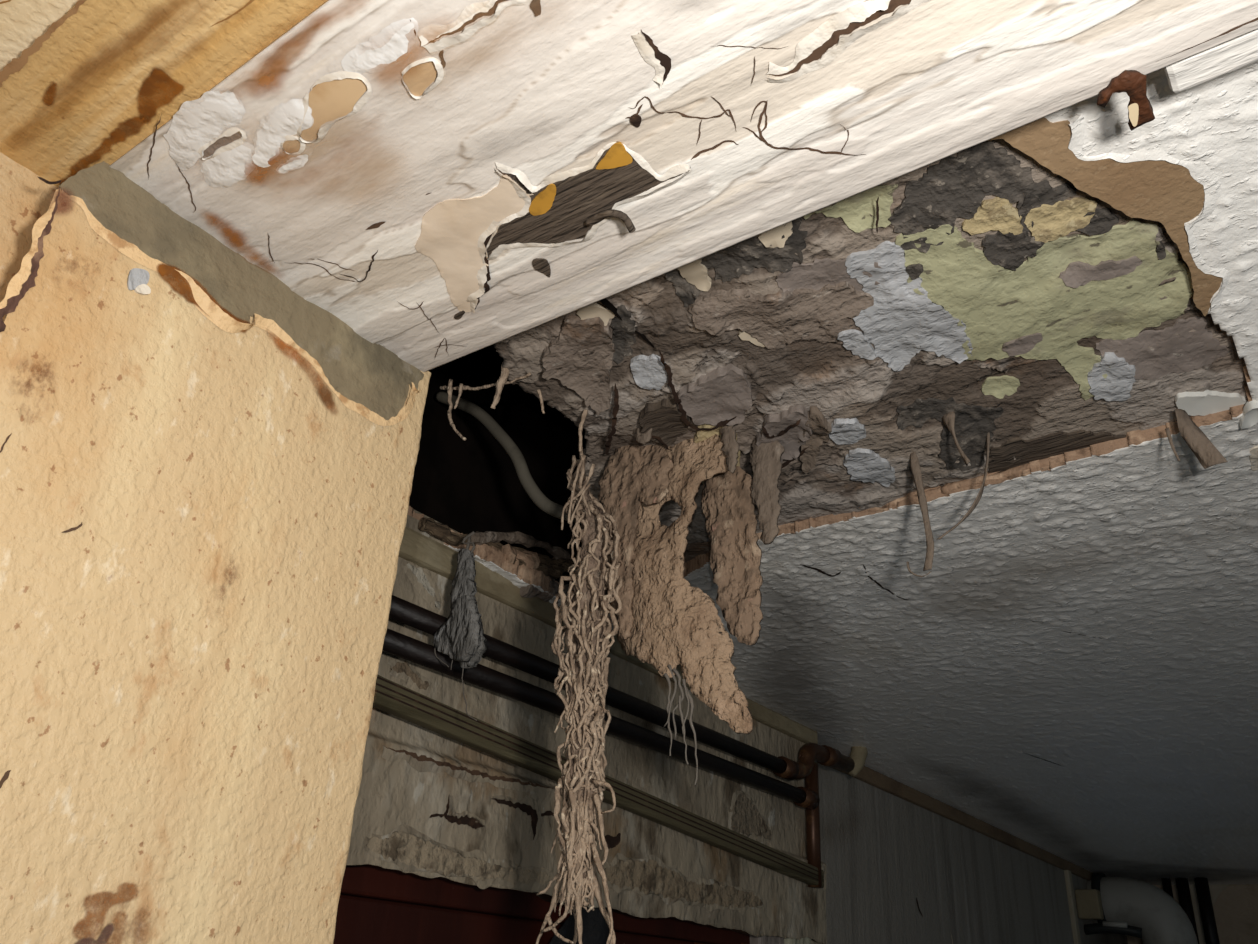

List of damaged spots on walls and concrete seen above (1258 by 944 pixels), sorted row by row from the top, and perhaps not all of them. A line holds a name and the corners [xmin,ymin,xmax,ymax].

water stain [43,82,56,106]
water stain [60,68,184,185]
crack [410,0,541,83]
crack [626,0,930,160]
crack [0,177,62,332]
spalling [58,161,424,426]
peeling [415,141,692,320]
peeling [677,258,711,291]
peeling [758,221,793,248]
spalling [630,354,752,466]
spalling [756,405,895,487]
peeling [1174,390,1258,471]